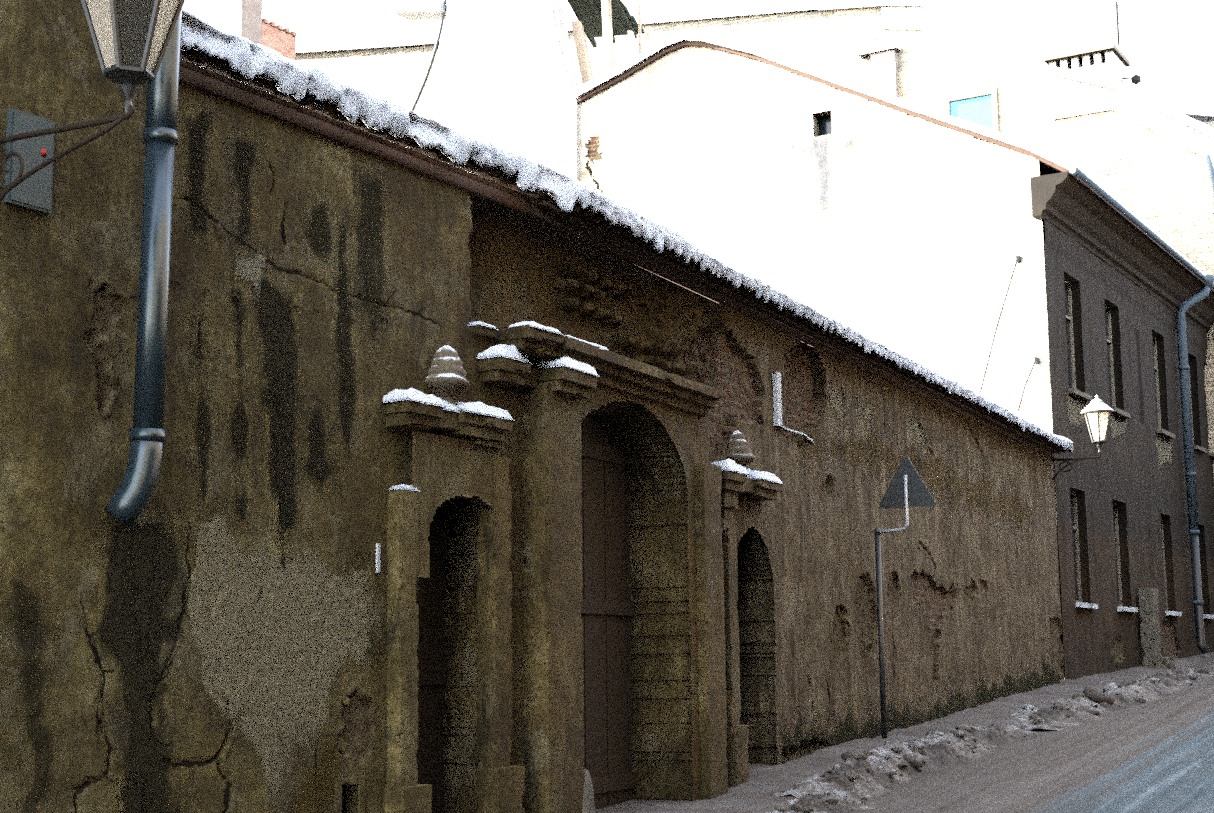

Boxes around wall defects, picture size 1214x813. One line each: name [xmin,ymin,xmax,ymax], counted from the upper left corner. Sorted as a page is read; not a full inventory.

crack [180,162,444,327]
crack [585,160,603,193]
spalling [83,274,127,413]
crack [72,525,233,813]
spalling [830,569,988,683]